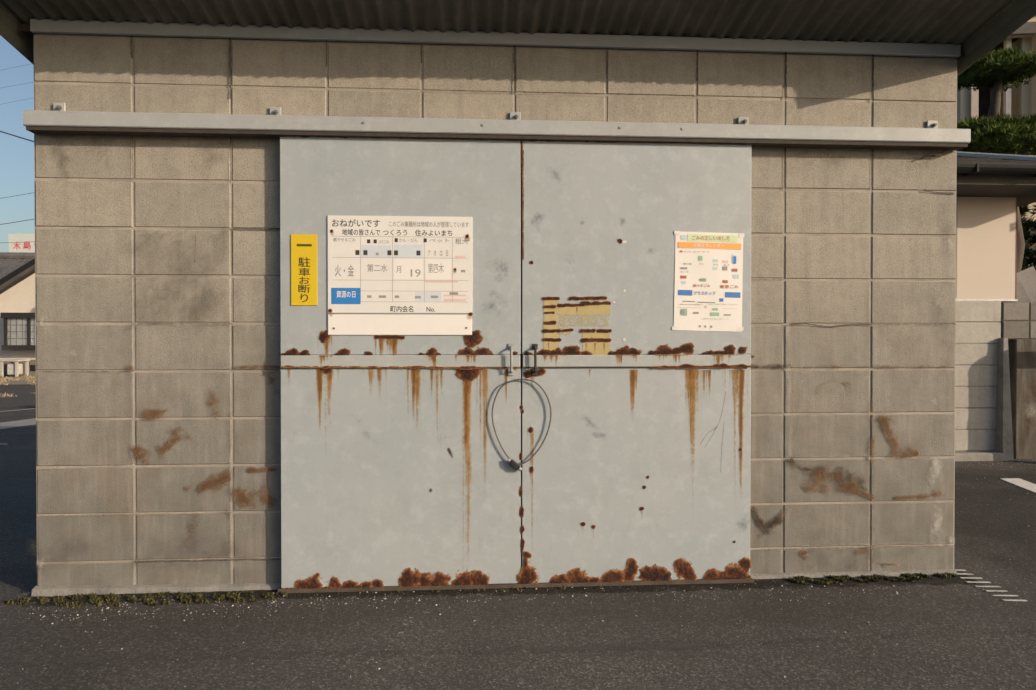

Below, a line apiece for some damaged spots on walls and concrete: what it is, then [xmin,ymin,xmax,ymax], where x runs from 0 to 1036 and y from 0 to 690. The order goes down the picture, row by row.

corrosion [143,409,166,420]
corrosion [130,428,189,464]
corrosion [233,330,592,536]
corrosion [870,410,920,463]
corrosion [185,470,276,507]
corrosion [788,458,874,500]
corrosion [895,492,941,500]
corrosion [285,573,383,589]
corrosion [398,568,490,587]